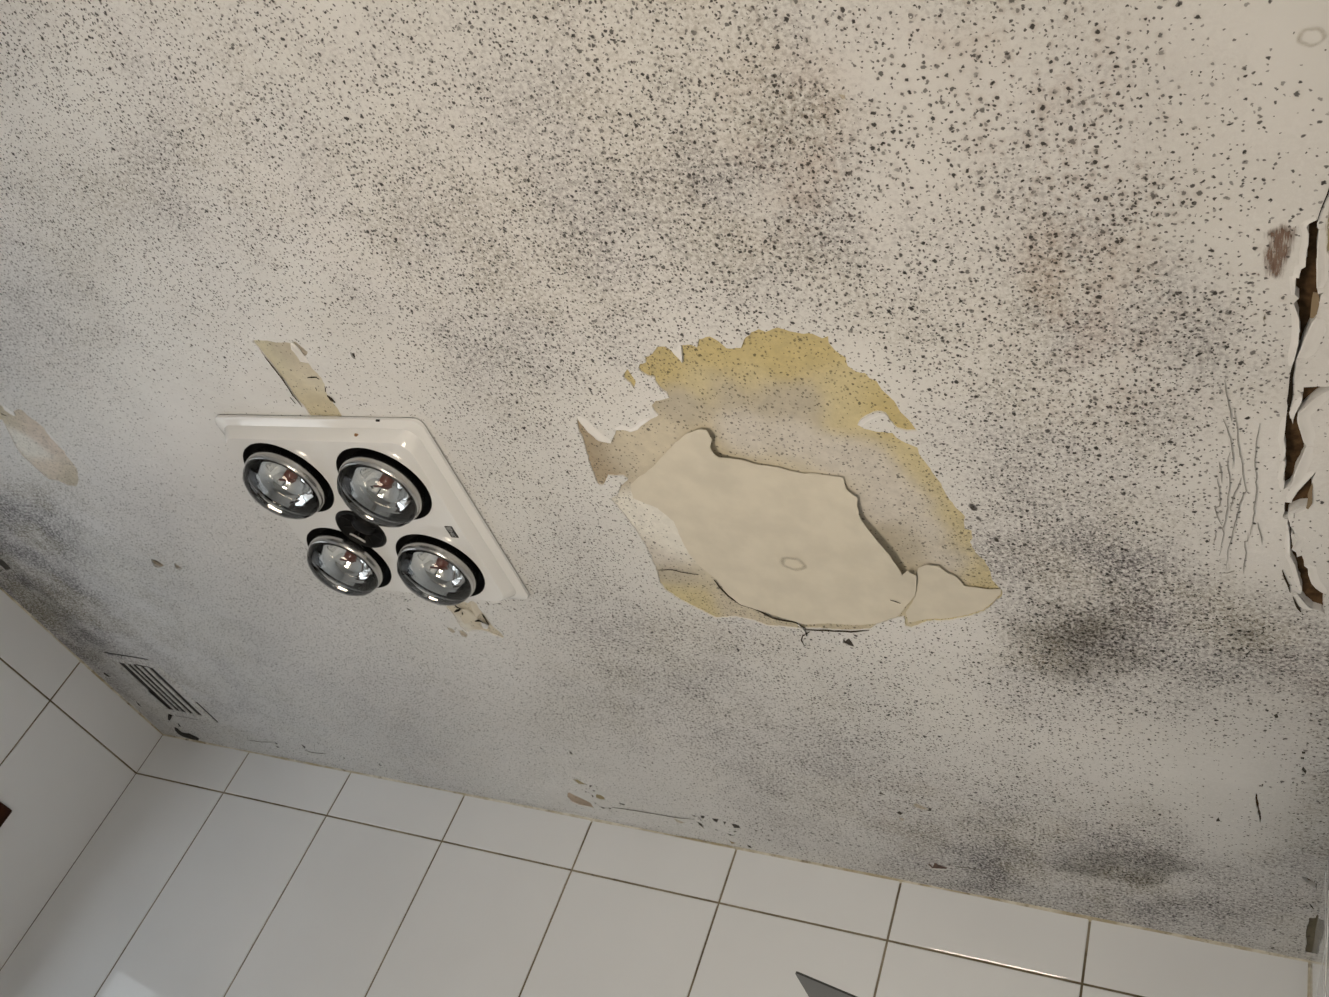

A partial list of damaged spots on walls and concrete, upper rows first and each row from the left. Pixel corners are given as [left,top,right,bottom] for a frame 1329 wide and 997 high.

peeling [0,405,79,486]
peeling [254,340,342,417]
peeling [577,328,1002,646]
crack [1214,189,1329,574]
peeling [1277,387,1329,612]
water stain [1007,604,1142,691]